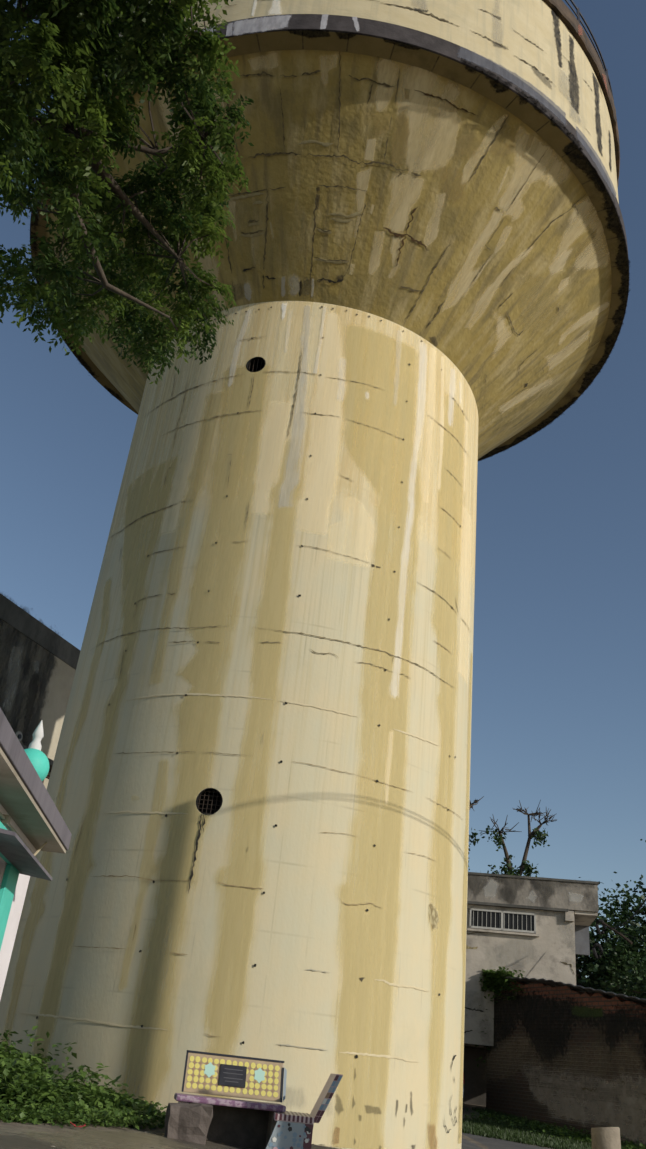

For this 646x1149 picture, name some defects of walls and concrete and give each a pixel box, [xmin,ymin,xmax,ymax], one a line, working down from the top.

damp [288,29,356,39]
damp [383,38,420,50]
damp [551,9,580,122]
damp [29,170,46,255]
crack [225,53,509,328]
crack [474,151,586,394]
damp [125,58,646,1149]
damp [0,619,55,747]
damp [33,329,221,1065]
crack [74,813,263,891]